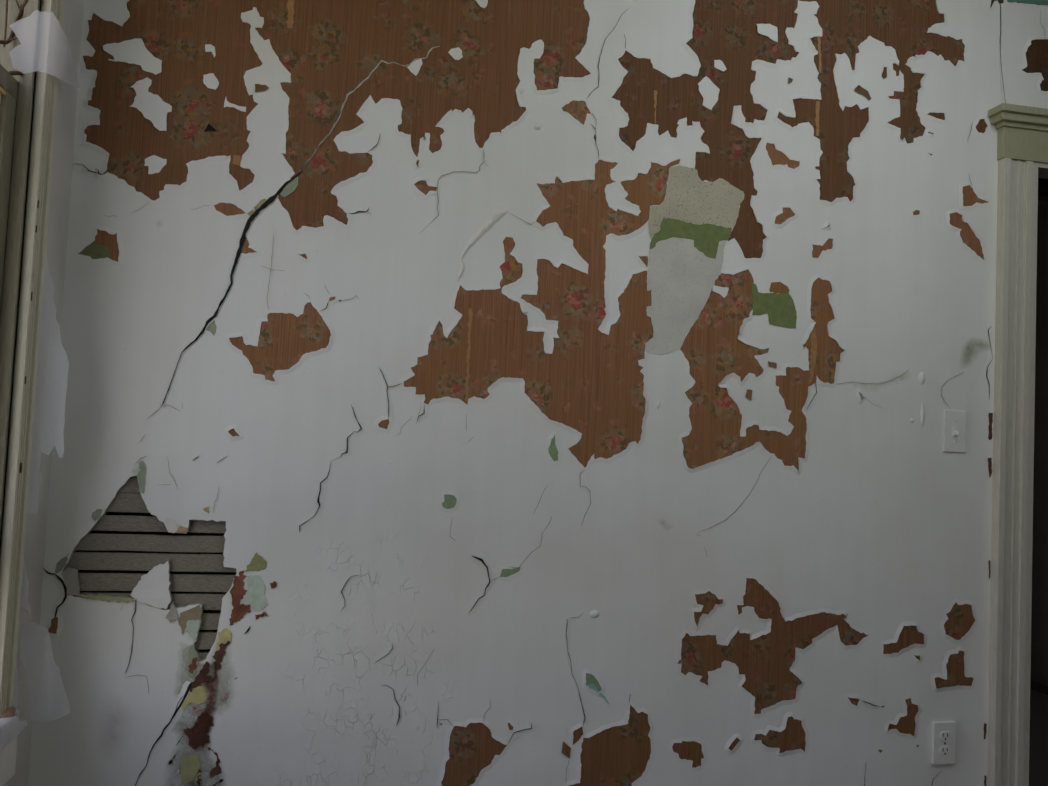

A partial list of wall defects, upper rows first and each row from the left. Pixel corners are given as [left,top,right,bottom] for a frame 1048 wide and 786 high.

peeling [1018,36,1048,95]
crack [134,46,438,488]
peeling [73,0,968,476]
crack [294,365,429,533]
crack [120,599,149,692]
flaking render [55,461,236,672]
crack [129,681,192,786]
water stain [168,552,277,786]
peeling [437,718,517,786]
crack [450,486,552,617]
peeling [562,700,655,786]
peeling [676,574,927,757]